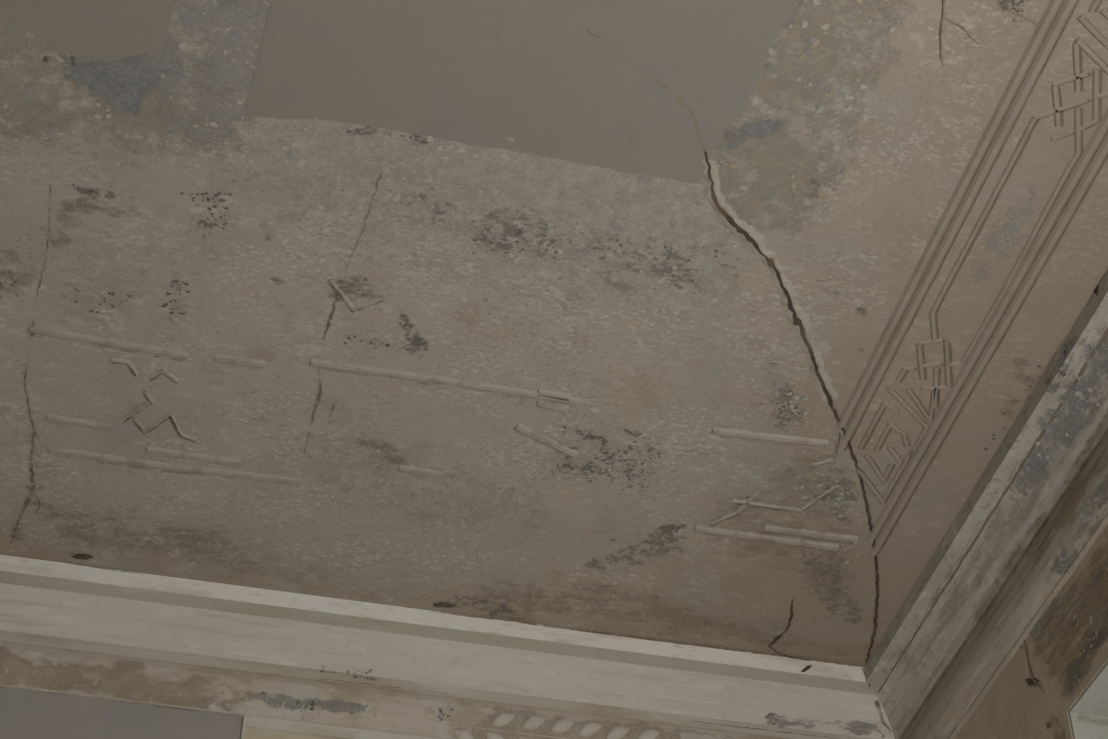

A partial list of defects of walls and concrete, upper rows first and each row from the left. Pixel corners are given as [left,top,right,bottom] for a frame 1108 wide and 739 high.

crack [940,0,980,68]
crack [421,0,892,733]
crack [3,372,168,578]